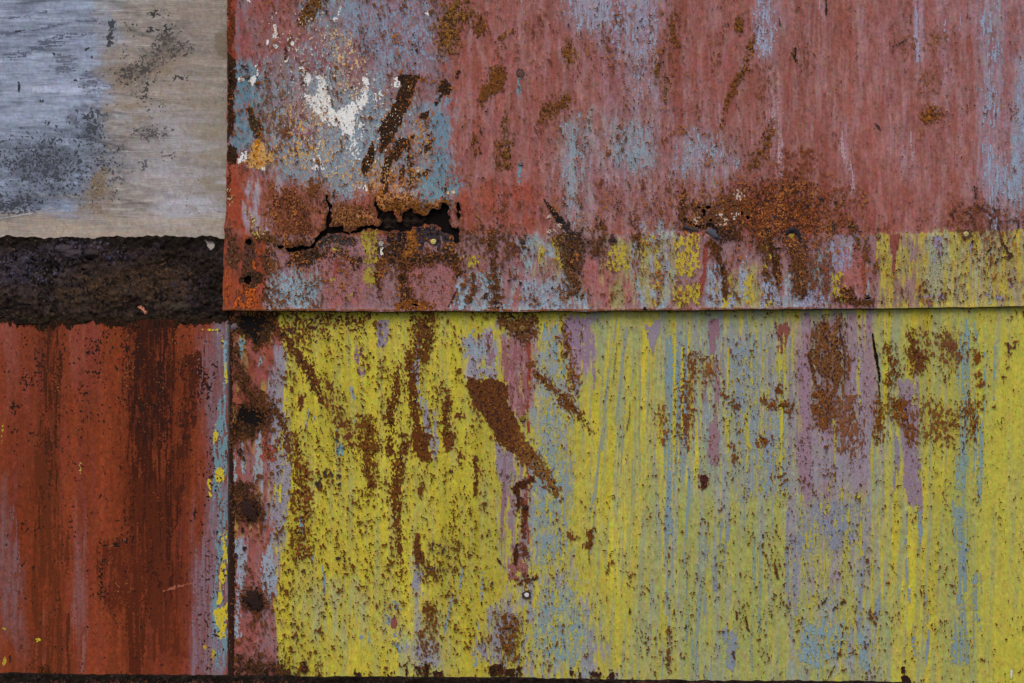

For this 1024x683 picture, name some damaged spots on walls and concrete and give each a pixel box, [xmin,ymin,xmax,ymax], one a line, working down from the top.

peeling [230,0,438,212]
rust [42,426,168,638]